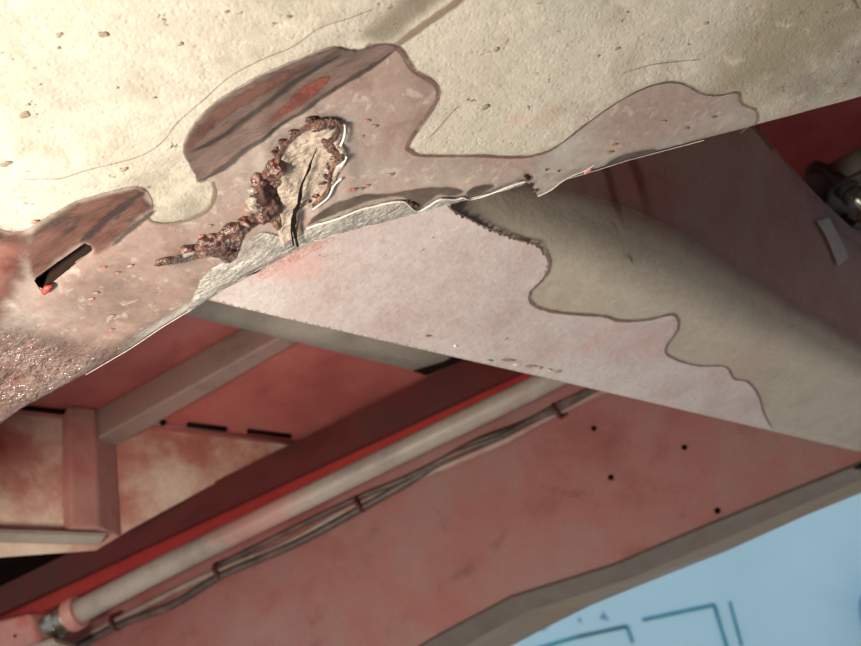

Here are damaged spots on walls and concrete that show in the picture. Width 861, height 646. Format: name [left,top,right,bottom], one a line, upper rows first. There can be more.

leakage [0,44,772,430]
spalling [86,116,704,375]